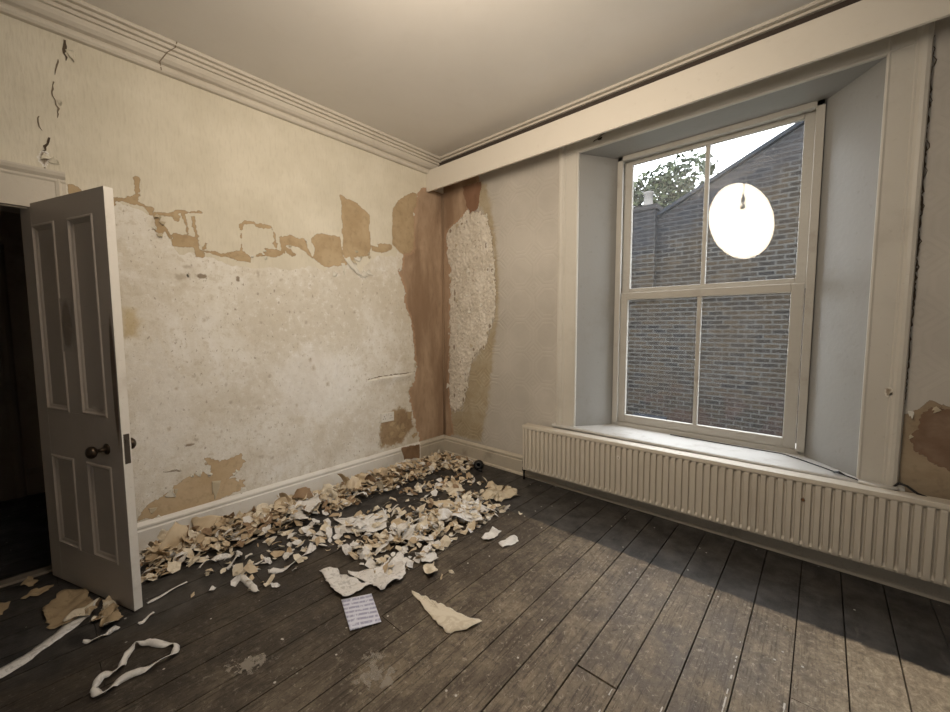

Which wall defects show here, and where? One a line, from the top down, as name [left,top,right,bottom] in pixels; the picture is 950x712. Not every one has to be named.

crack [37,40,75,168]
peeling [113,176,417,290]
crack [904,35,937,404]
peeling [446,209,497,413]
peeling [137,453,246,521]
peeling [899,400,950,500]